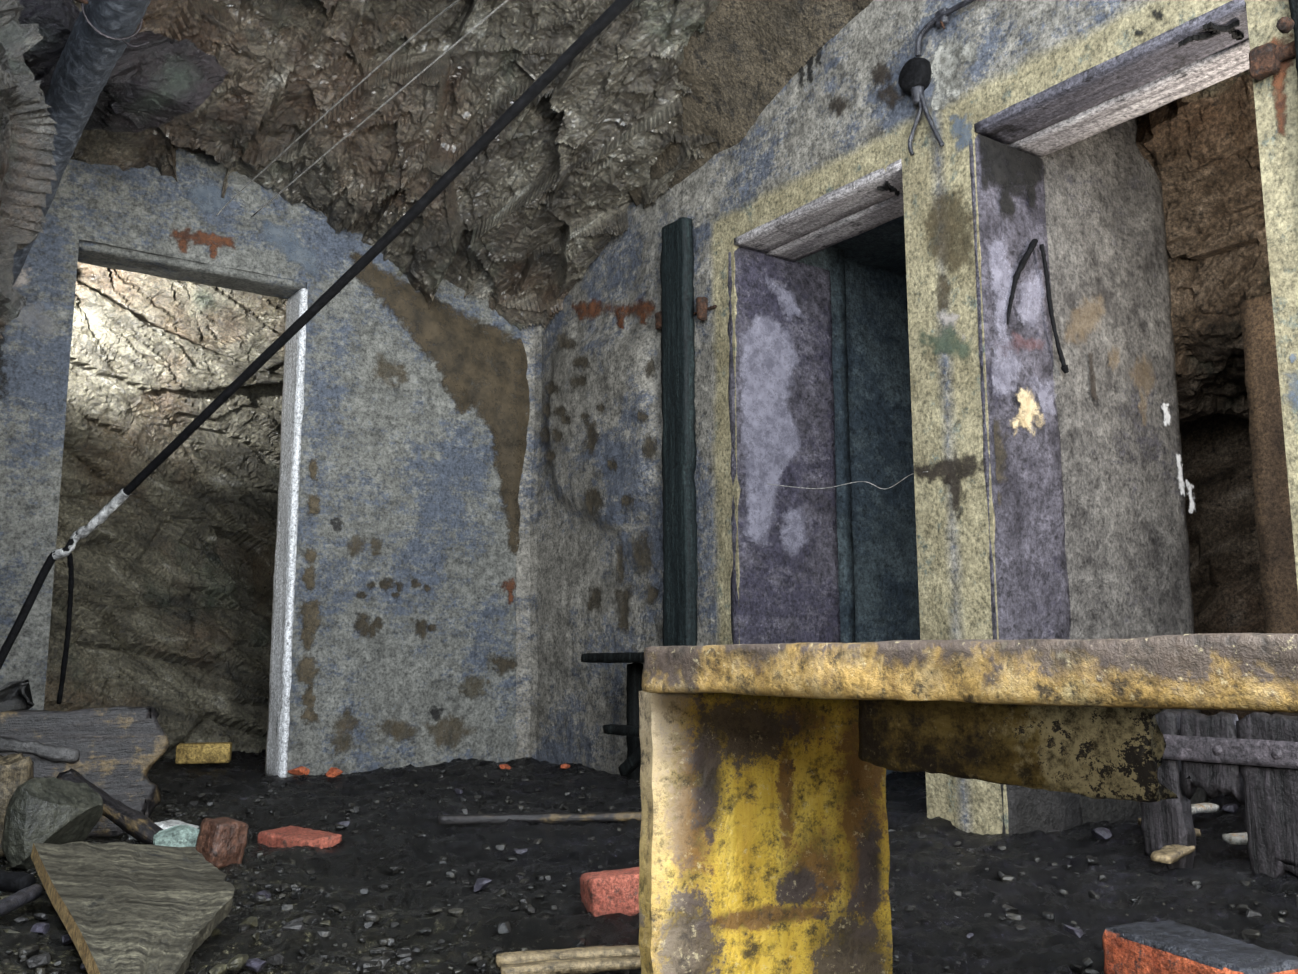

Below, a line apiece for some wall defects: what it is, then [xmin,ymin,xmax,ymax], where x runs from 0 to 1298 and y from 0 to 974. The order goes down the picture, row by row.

corrosion [1269,34,1293,136]
corrosion [173,228,235,259]
peeling [375,354,407,386]
damp [914,454,985,518]
peeling [348,536,382,556]
damp [332,711,358,751]
damp [381,706,471,748]